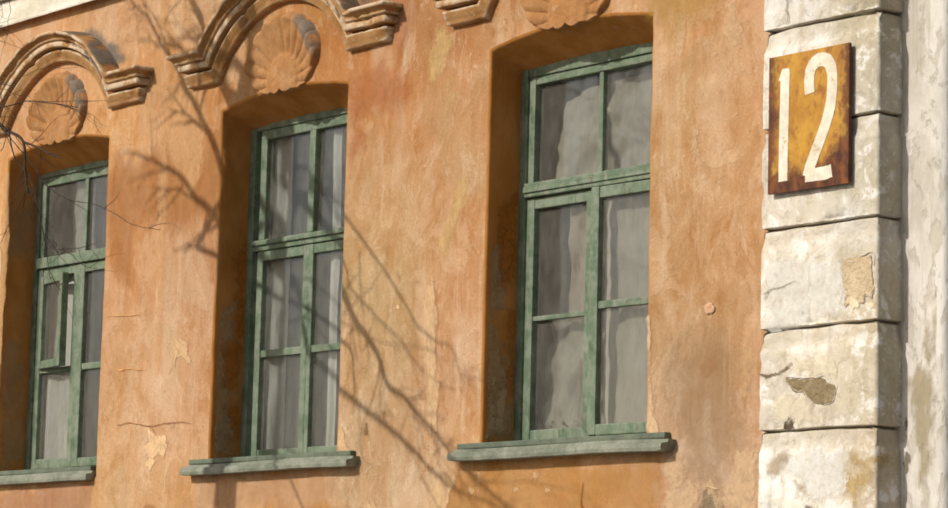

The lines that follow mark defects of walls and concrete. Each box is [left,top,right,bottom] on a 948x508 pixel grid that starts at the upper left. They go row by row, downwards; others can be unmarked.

peeling [767,251,876,335]
flaking render [786,375,837,405]
peeling [144,427,167,471]
peeling [662,451,768,508]
peeling [787,447,849,499]